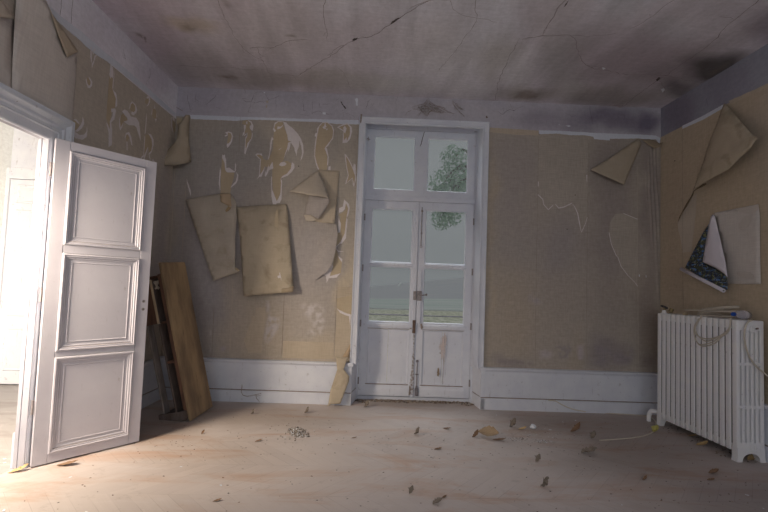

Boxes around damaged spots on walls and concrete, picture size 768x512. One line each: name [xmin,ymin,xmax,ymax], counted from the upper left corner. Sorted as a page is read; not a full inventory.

crack [218,0,430,76]
peeling [257,122,291,200]